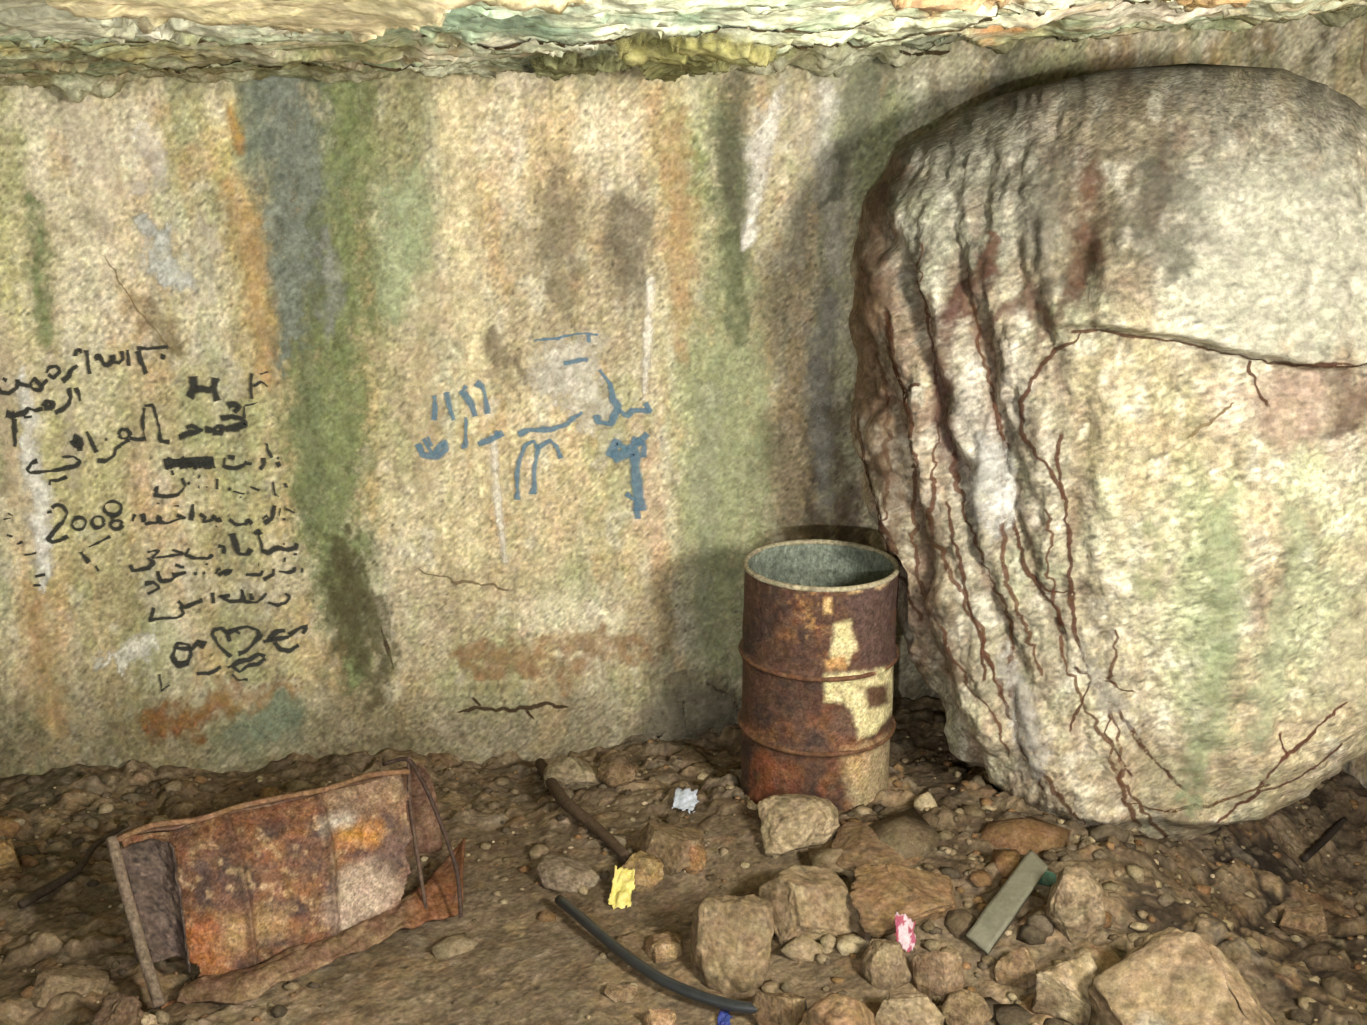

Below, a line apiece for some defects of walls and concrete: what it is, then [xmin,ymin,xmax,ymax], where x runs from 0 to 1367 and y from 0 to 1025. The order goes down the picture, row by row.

crack [1122,0,1186,12]
crack [82,34,322,74]
crack [364,7,1072,72]
damp [241,76,343,519]
damp [324,525,398,712]
crack [458,698,568,719]